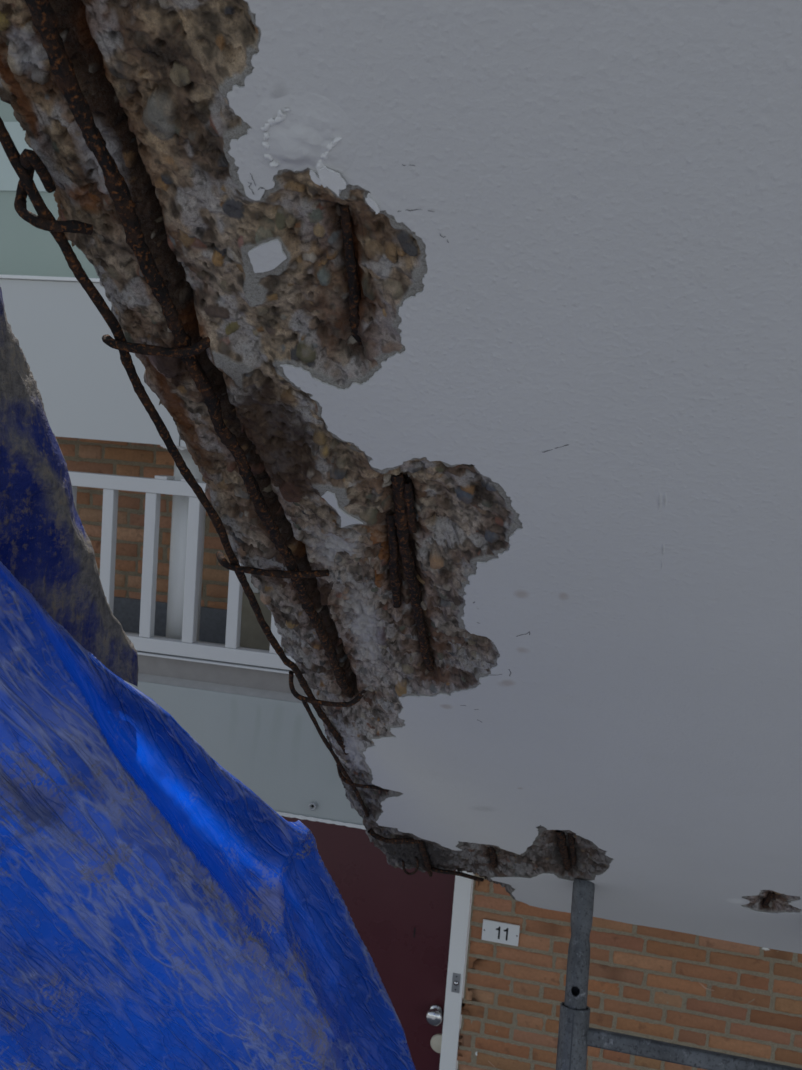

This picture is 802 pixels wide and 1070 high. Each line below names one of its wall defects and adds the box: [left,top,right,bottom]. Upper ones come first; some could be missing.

corrosion [0,42,67,183]
corrosion [59,0,126,113]
corrosion [112,289,344,564]
spalling [0,0,523,841]
corrosion [312,577,369,698]
spalling [457,825,613,901]
spalling [742,890,802,913]